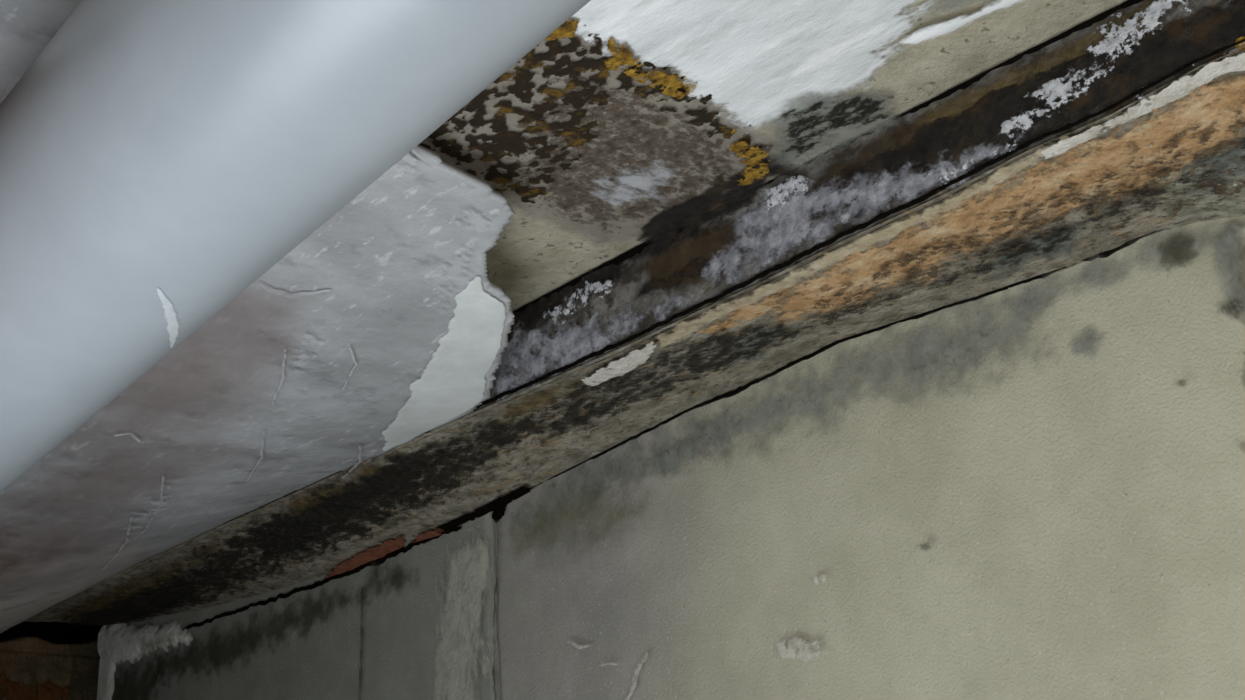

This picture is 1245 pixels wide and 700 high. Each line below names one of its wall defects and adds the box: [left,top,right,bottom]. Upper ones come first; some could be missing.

leakage [419,0,1245,349]
rust [697,76,1245,334]
crack [181,526,462,689]
spalling [323,486,531,580]
leakage [52,131,1245,700]
crack [529,228,1166,490]